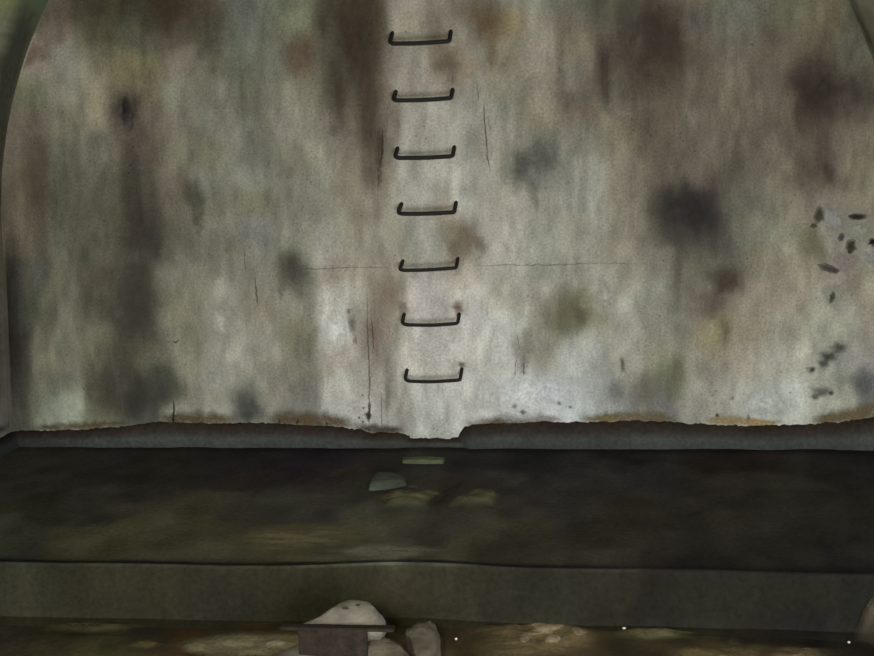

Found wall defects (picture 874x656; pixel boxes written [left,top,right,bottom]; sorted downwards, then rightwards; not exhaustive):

spalling [810,206,824,228]
spalling [838,232,857,254]
spalling [817,263,840,274]
crack [358,314,382,423]
corrosion [589,413,665,422]
corrosion [713,417,777,425]
corrosion [820,404,874,423]